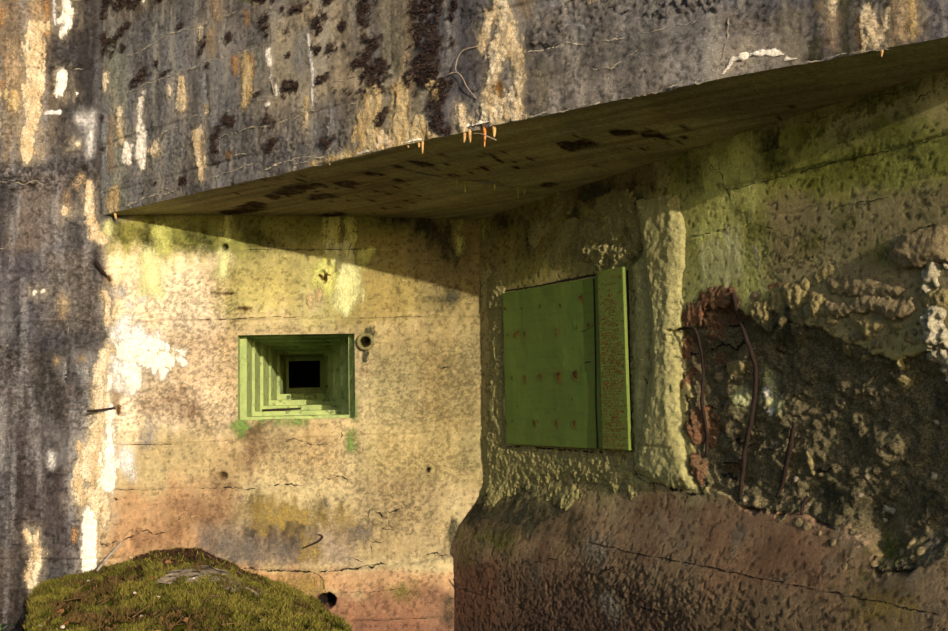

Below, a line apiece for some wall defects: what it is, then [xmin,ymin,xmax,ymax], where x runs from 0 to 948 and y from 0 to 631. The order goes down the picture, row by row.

leakage [0,0,78,165]
leakage [191,0,220,183]
leakage [218,0,547,266]
leakage [557,135,599,152]
leakage [610,125,687,151]
leakage [721,0,920,75]
leakage [696,223,742,292]
leakage [48,289,188,573]
crack [199,471,353,490]
spalling [678,225,948,572]
crack [244,493,410,593]
crack [584,542,940,619]